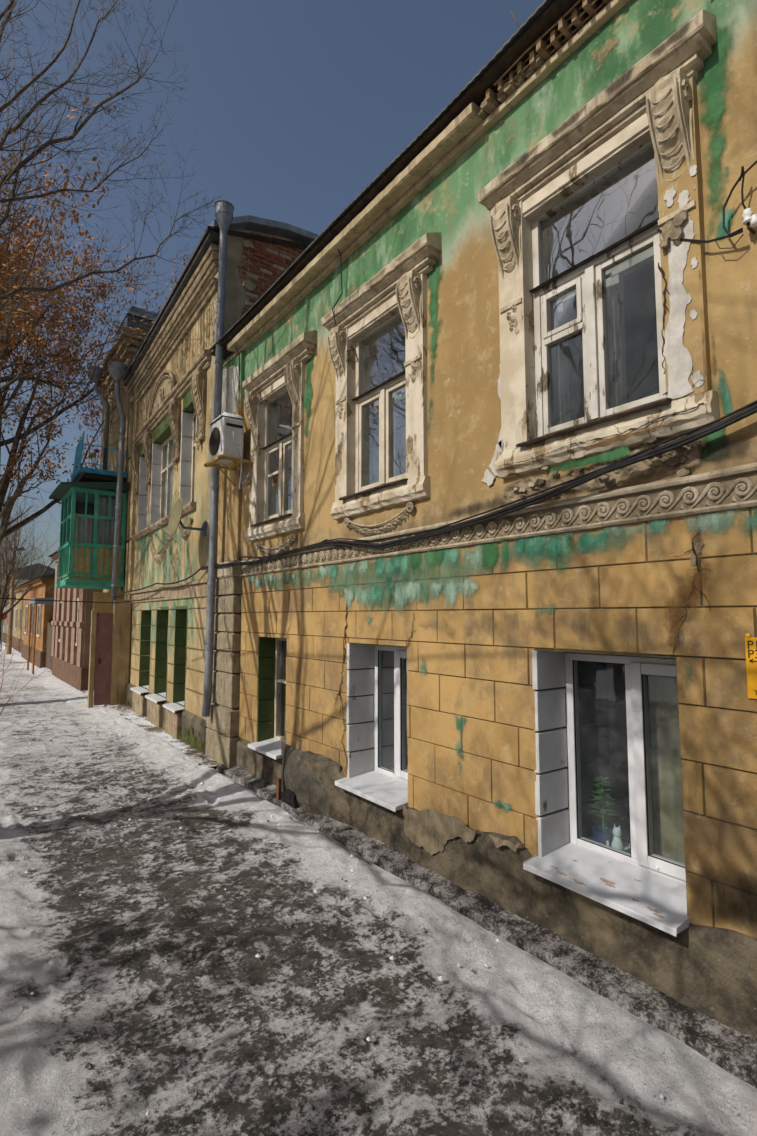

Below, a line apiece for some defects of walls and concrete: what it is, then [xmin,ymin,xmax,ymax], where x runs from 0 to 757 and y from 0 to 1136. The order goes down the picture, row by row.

peeling [689,26,735,238]
spalling [238,232,304,318]
peeling [659,186,704,399]
spalling [481,376,732,505]
peeling [248,519,667,623]
crack [669,515,711,656]
peeling [456,716,466,768]